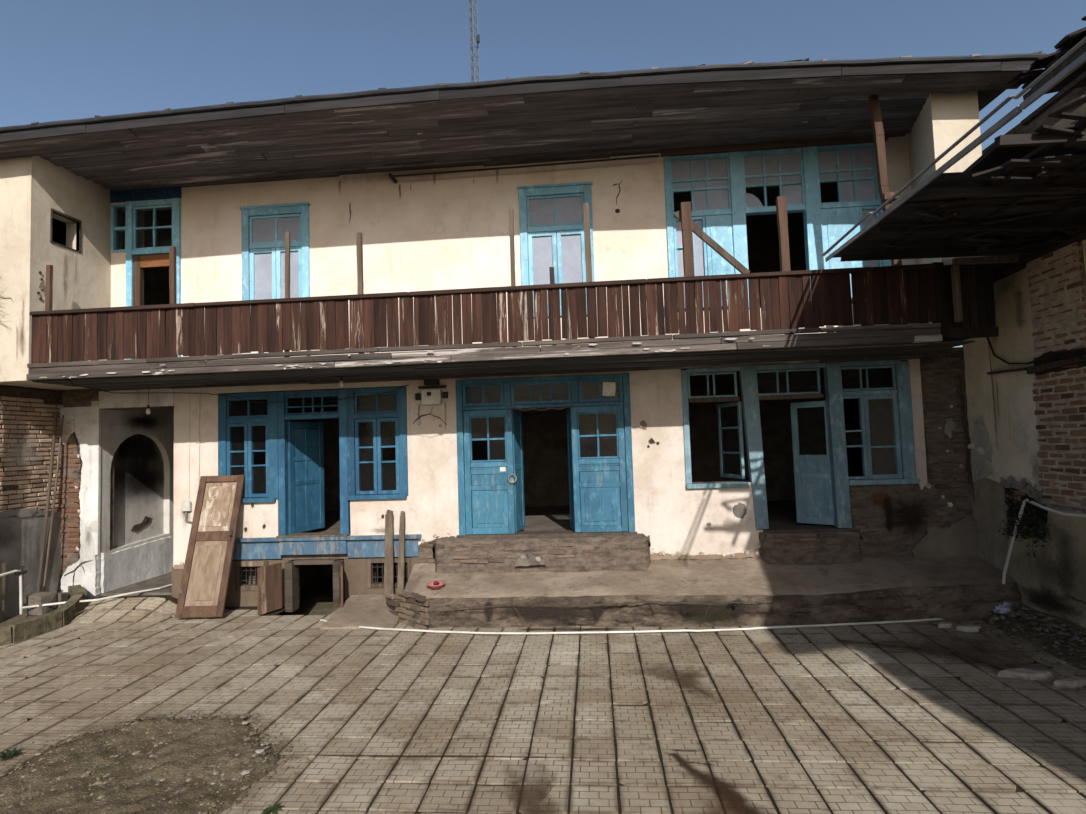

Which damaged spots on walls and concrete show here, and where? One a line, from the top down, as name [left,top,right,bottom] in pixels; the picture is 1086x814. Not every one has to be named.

water stain [118,436,154,462]
flaking render [0,418,82,578]
flaking render [1000,476,1086,534]
water stain [1025,589,1075,616]